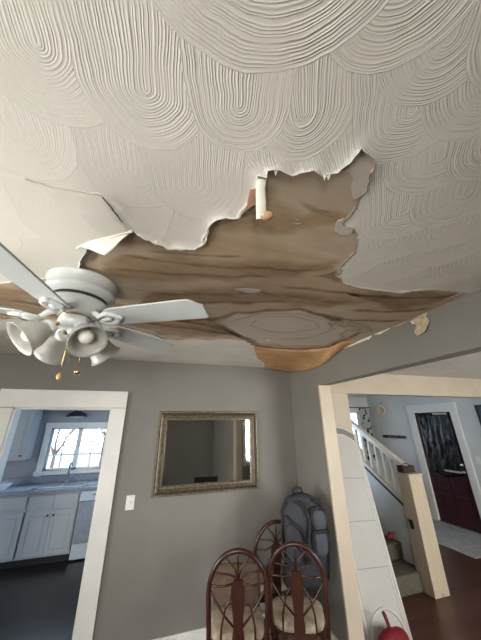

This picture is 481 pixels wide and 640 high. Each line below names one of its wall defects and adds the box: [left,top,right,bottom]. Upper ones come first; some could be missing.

crack [25,178,122,222]
leakage [187,309,359,349]
peeling [410,313,430,336]